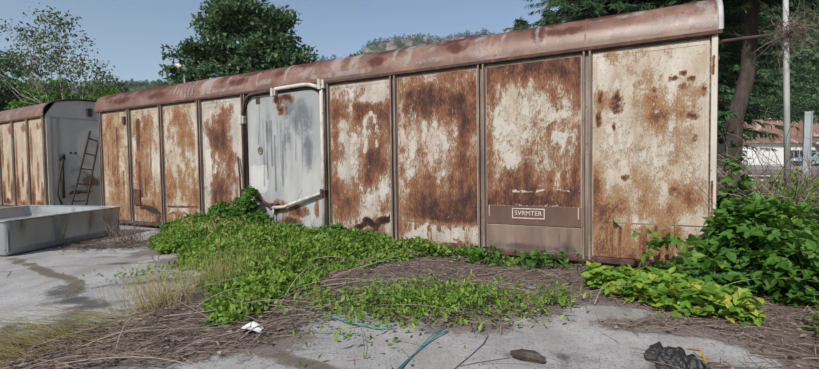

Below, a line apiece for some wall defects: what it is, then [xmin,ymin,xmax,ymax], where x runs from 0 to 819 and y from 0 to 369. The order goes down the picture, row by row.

corrosion [357,48,404,67]
corrosion [436,37,478,54]
corrosion [510,6,670,42]
corrosion [0,122,45,205]
corrosion [70,83,238,223]
corrosion [273,94,294,119]
corrosion [330,69,477,247]
corrosion [486,56,581,208]
corrosion [593,49,714,262]
corrosion [274,198,319,225]